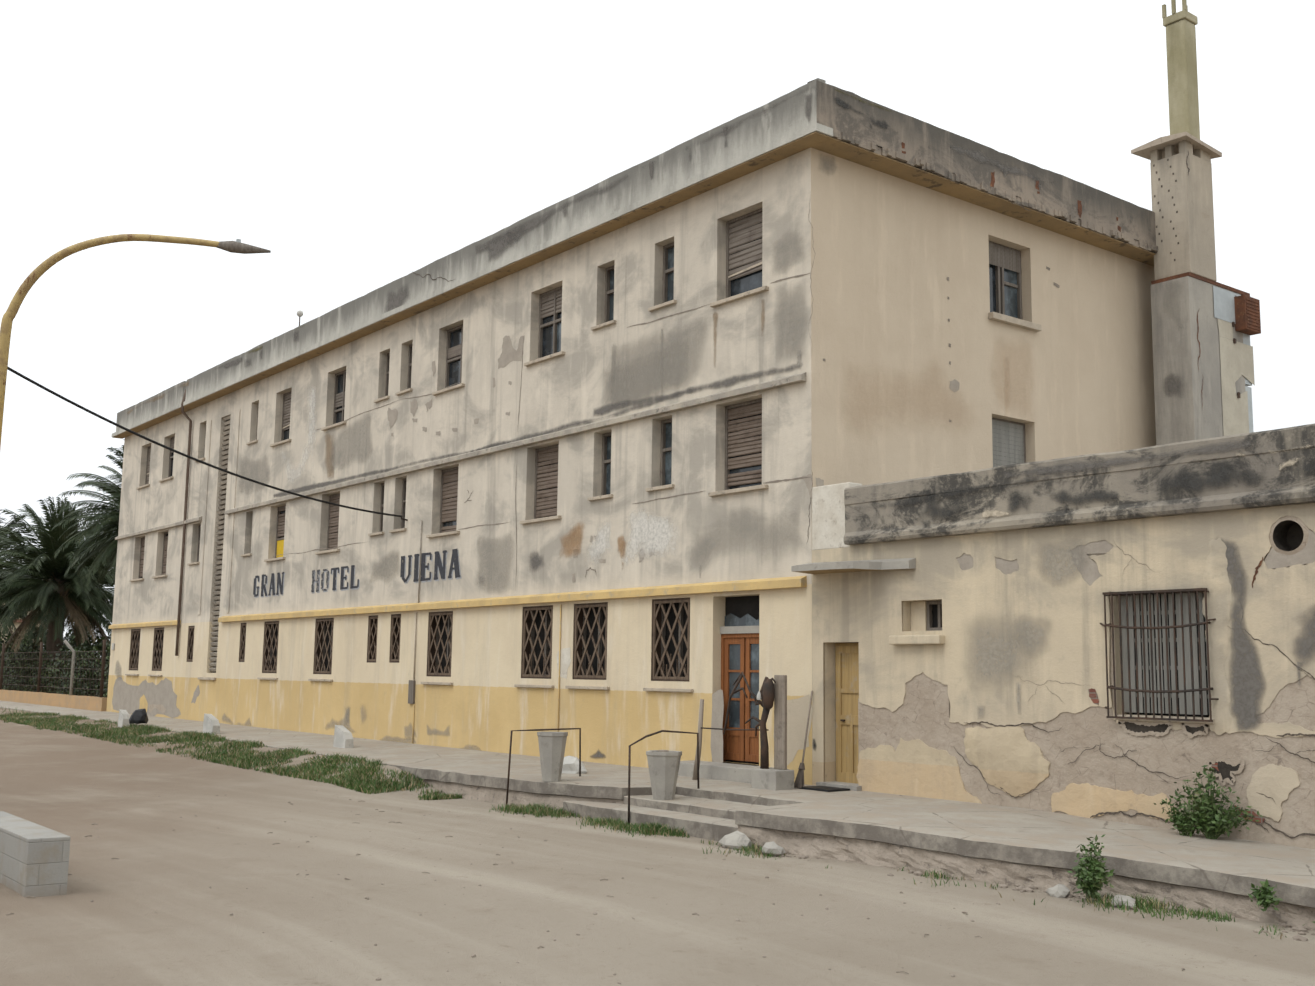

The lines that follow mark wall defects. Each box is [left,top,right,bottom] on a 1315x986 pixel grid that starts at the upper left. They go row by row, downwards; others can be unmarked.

leakage [476,184,616,259]
leakage [386,288,408,312]
leakage [880,455,1168,528]
leakage [1162,441,1259,491]
flaking render [995,557,1019,575]
flaking render [1070,540,1113,586]
leakage [1225,543,1264,730]
crack [1228,557,1315,680]
leakage [1296,611,1315,678]
peeling [112,677,200,718]
spalling [858,672,1315,849]